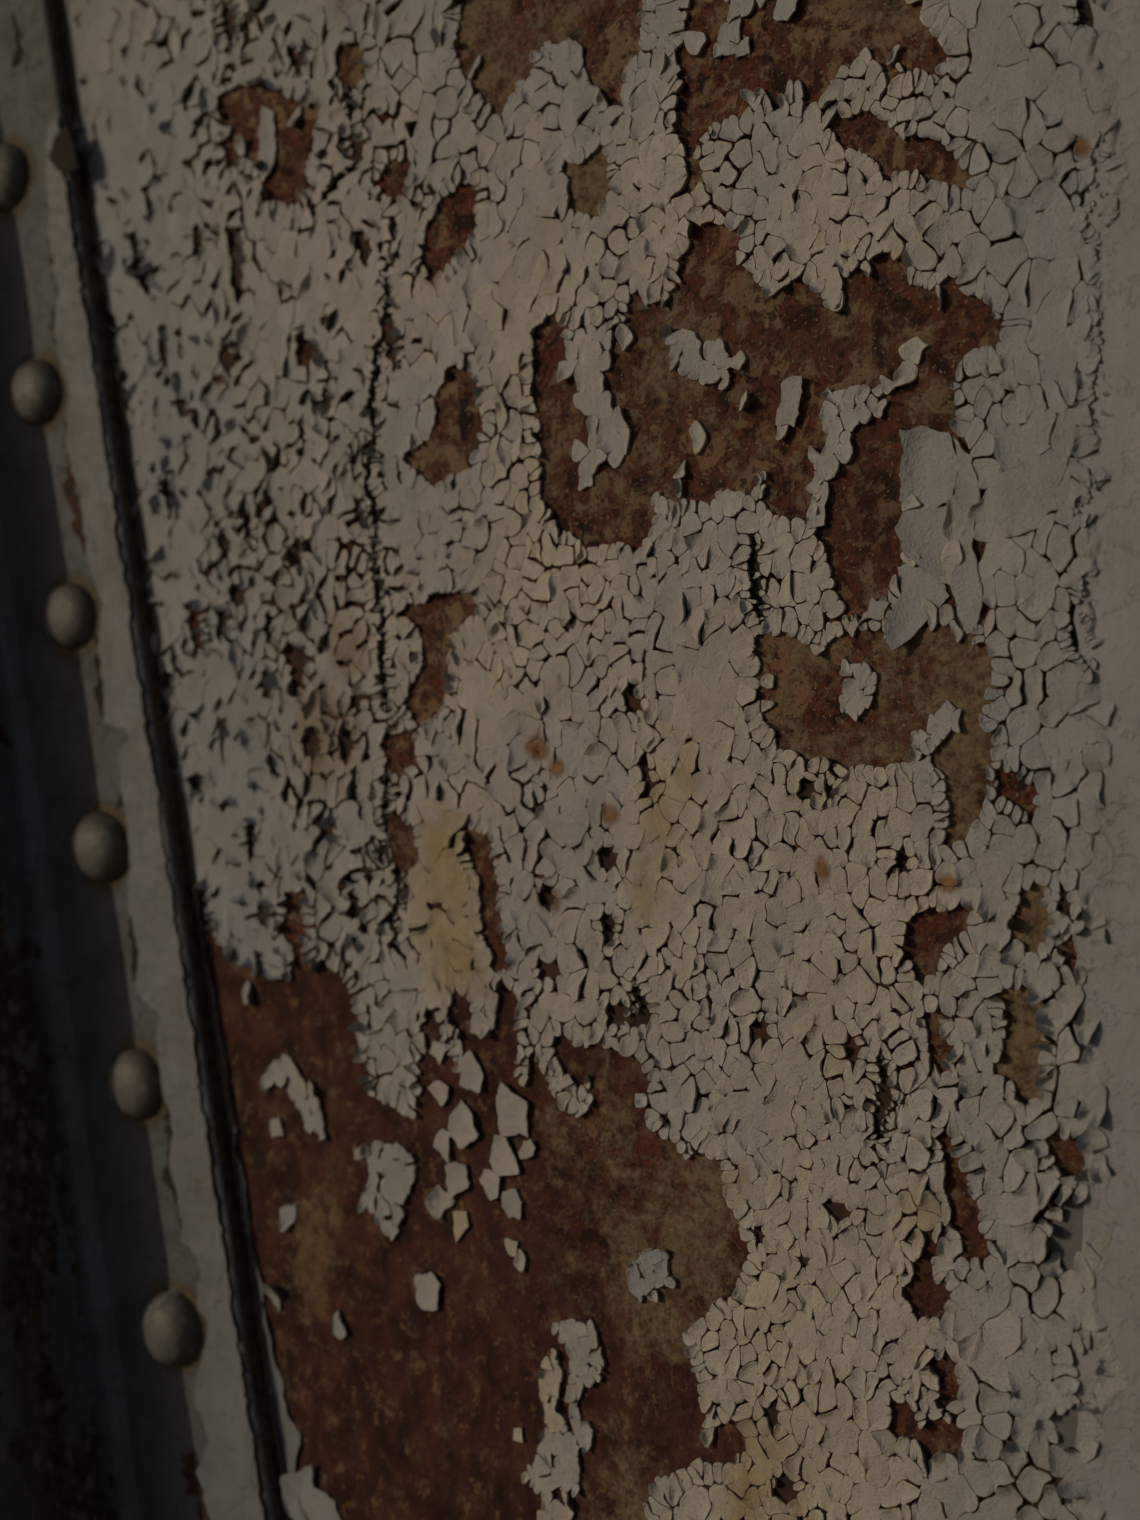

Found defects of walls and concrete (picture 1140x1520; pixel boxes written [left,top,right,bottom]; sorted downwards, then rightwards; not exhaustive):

corrosion [456,0,953,194]
crack [350,259,413,719]
peeling [63,0,971,1119]
crack [747,541,770,626]
corrosion [532,222,1039,850]
corrosion [58,0,750,1520]
peeling [476,0,1130,1520]
crack [377,777,408,958]
crack [868,1051,906,1146]
peeling [279,1204,297,1232]
peeling [425,1184,456,1219]
corrosion [904,1122,994,1320]